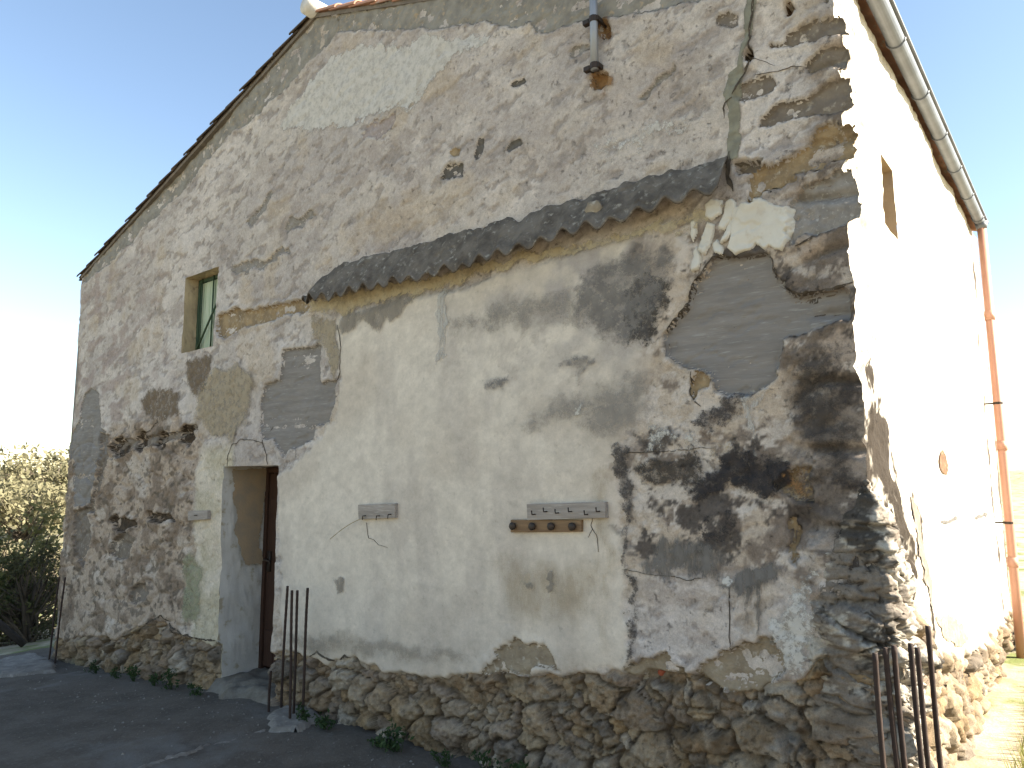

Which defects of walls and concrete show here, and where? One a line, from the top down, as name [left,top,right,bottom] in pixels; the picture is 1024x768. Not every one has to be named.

crack [722,0,807,191]
peeling [690,15,862,272]
damp [309,209,709,375]
flaking render [690,370,710,399]
flaking render [73,433,110,566]
damp [611,347,861,679]
flaking render [482,637,558,677]